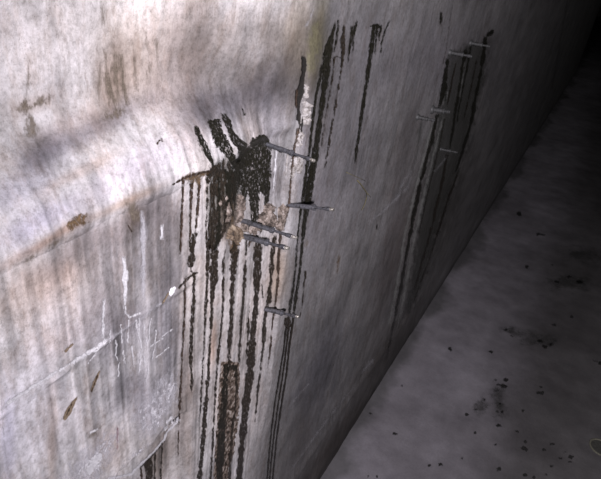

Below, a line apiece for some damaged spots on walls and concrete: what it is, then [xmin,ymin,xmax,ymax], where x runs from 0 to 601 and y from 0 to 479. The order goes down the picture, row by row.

corrosion [67,214,87,230]
leakage [178,113,282,479]
spalling [216,193,289,252]
spalling [286,84,314,179]
leakage [267,22,358,479]
leakage [354,21,390,162]
leakage [386,30,494,358]